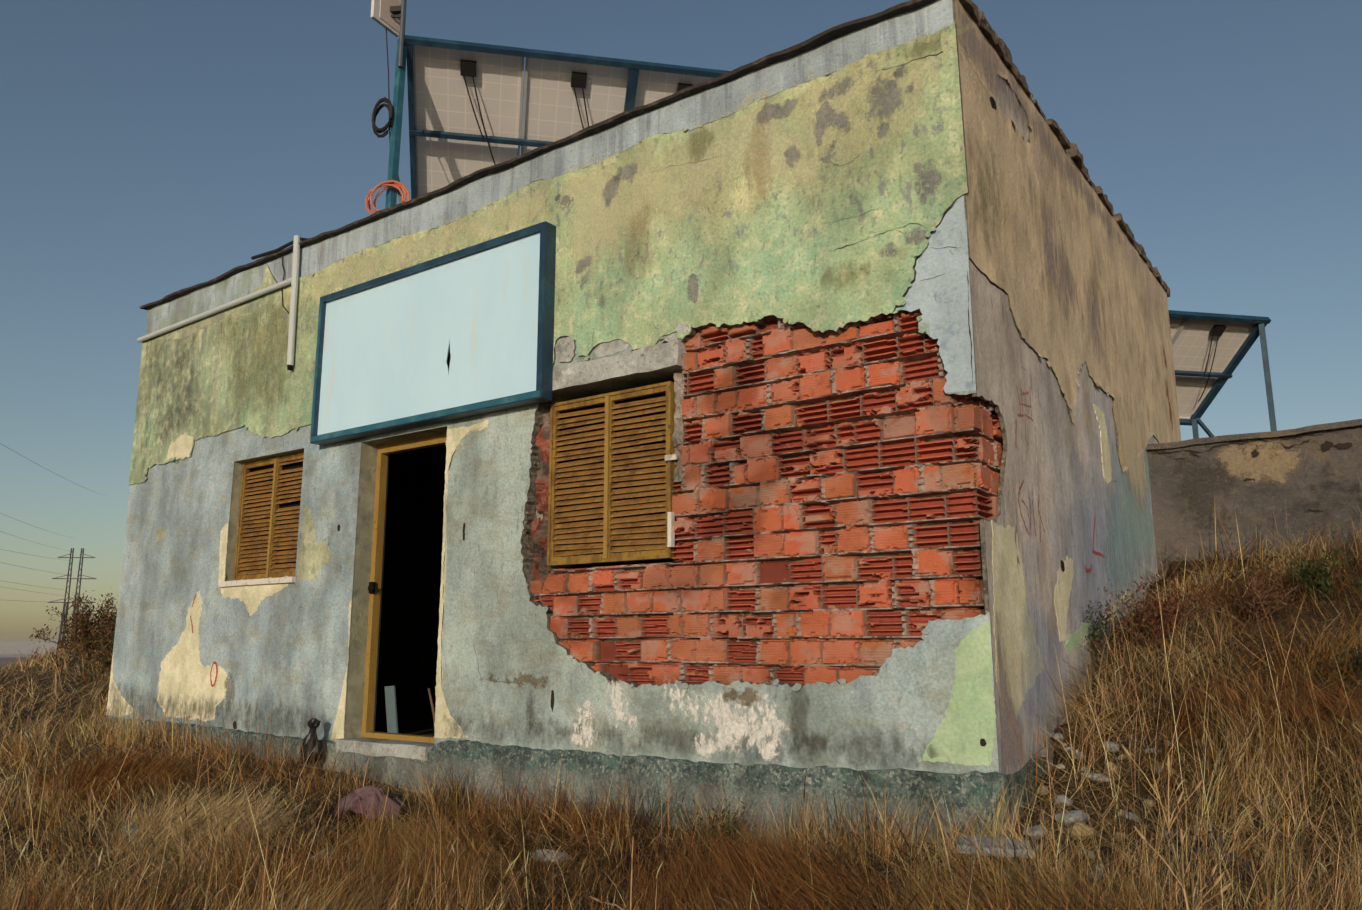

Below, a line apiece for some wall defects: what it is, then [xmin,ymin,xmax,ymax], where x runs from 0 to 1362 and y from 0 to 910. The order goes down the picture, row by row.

peeling [989,77,1032,141]
water stain [311,67,926,291]
water stain [914,164,941,202]
water stain [688,274,698,303]
spalling [106,195,1159,774]
water stain [565,700,597,748]
water stain [607,681,637,728]
water stain [664,685,825,760]